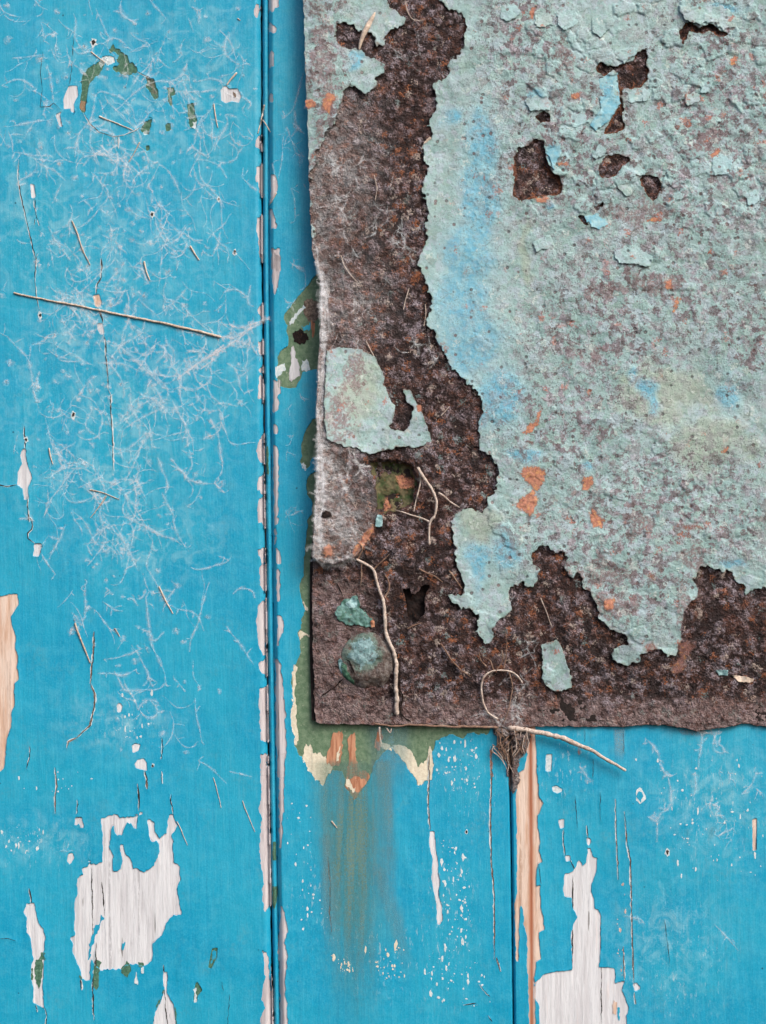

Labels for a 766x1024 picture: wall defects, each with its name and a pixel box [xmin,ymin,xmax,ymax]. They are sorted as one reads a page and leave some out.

peeling [56,39,175,127]
peeling [254,0,279,33]
peeling [571,44,652,131]
peeling [679,5,742,31]
peeling [255,134,281,294]
peeling [613,243,653,267]
corrosion [305,0,766,731]
peeling [0,594,19,772]
peeling [256,274,490,1024]
peeling [24,903,46,1008]
peeling [67,812,182,990]
peeling [514,726,640,1024]